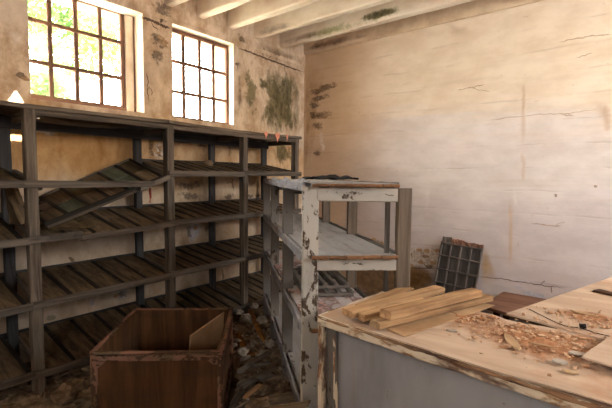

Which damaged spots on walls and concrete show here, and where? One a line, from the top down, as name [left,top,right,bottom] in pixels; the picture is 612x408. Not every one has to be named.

crack [141,16,171,30]
leakage [149,0,175,26]
leakage [146,28,170,68]
crack [557,34,612,43]
leakage [249,21,373,170]
crack [481,109,597,122]
peeling [410,245,440,268]
crack [479,276,564,293]